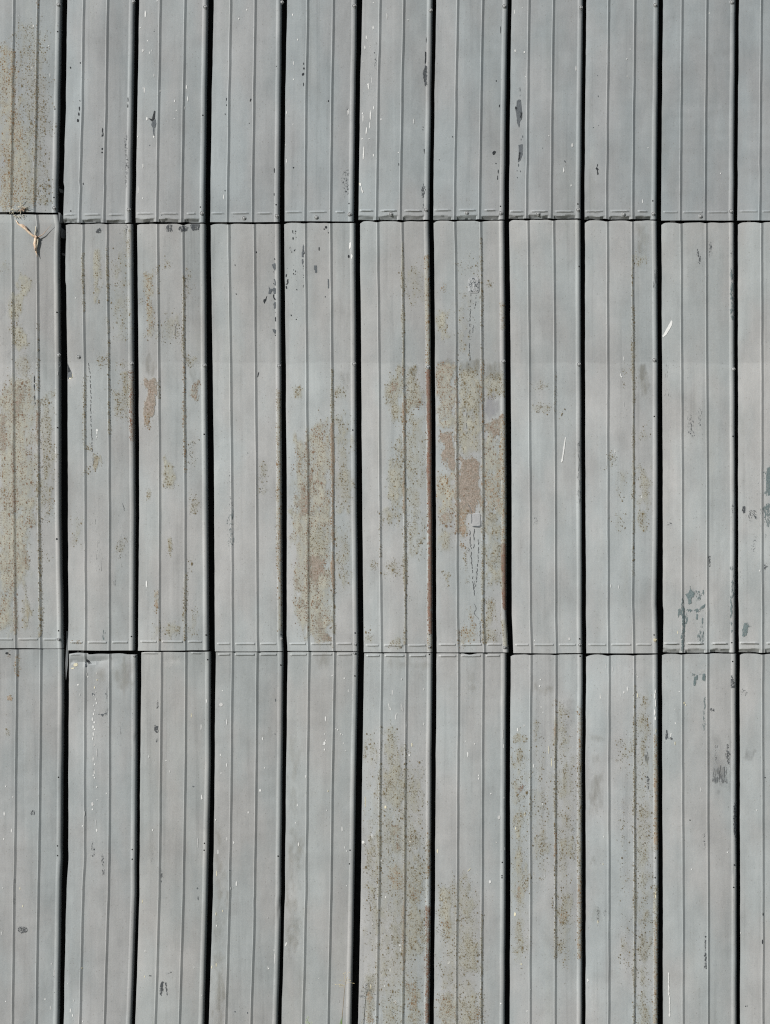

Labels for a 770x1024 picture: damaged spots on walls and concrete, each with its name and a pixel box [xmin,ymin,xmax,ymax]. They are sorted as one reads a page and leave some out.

corrosion [0,0,58,212]
corrosion [0,276,55,638]
corrosion [81,229,201,489]
corrosion [259,369,356,648]
corrosion [370,238,508,651]
peeling [678,589,705,652]
corrosion [361,726,485,1024]
corrosion [510,702,583,969]